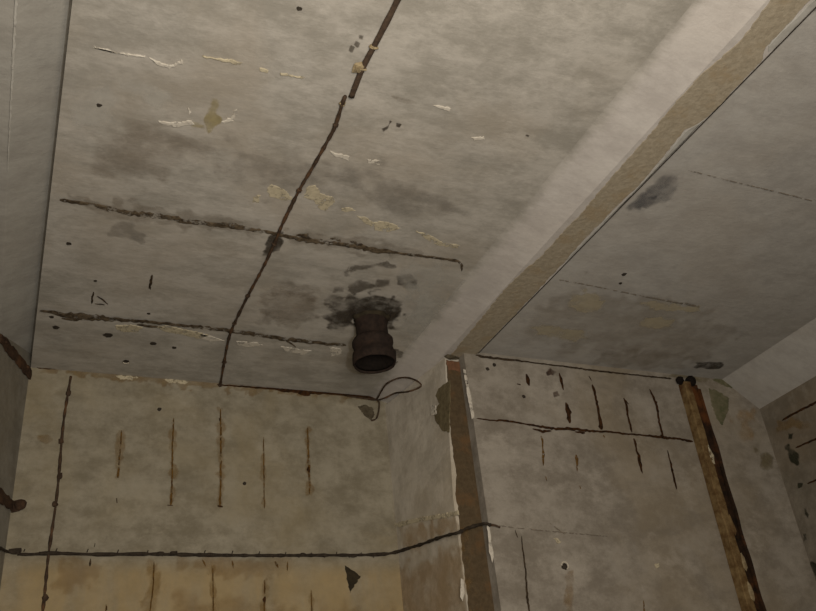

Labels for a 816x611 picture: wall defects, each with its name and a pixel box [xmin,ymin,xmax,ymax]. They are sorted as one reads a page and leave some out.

flaking render [768,0,816,52]
peeling [93,46,183,69]
peeling [158,108,195,127]
rust [589,376,605,438]
rust [623,398,643,473]